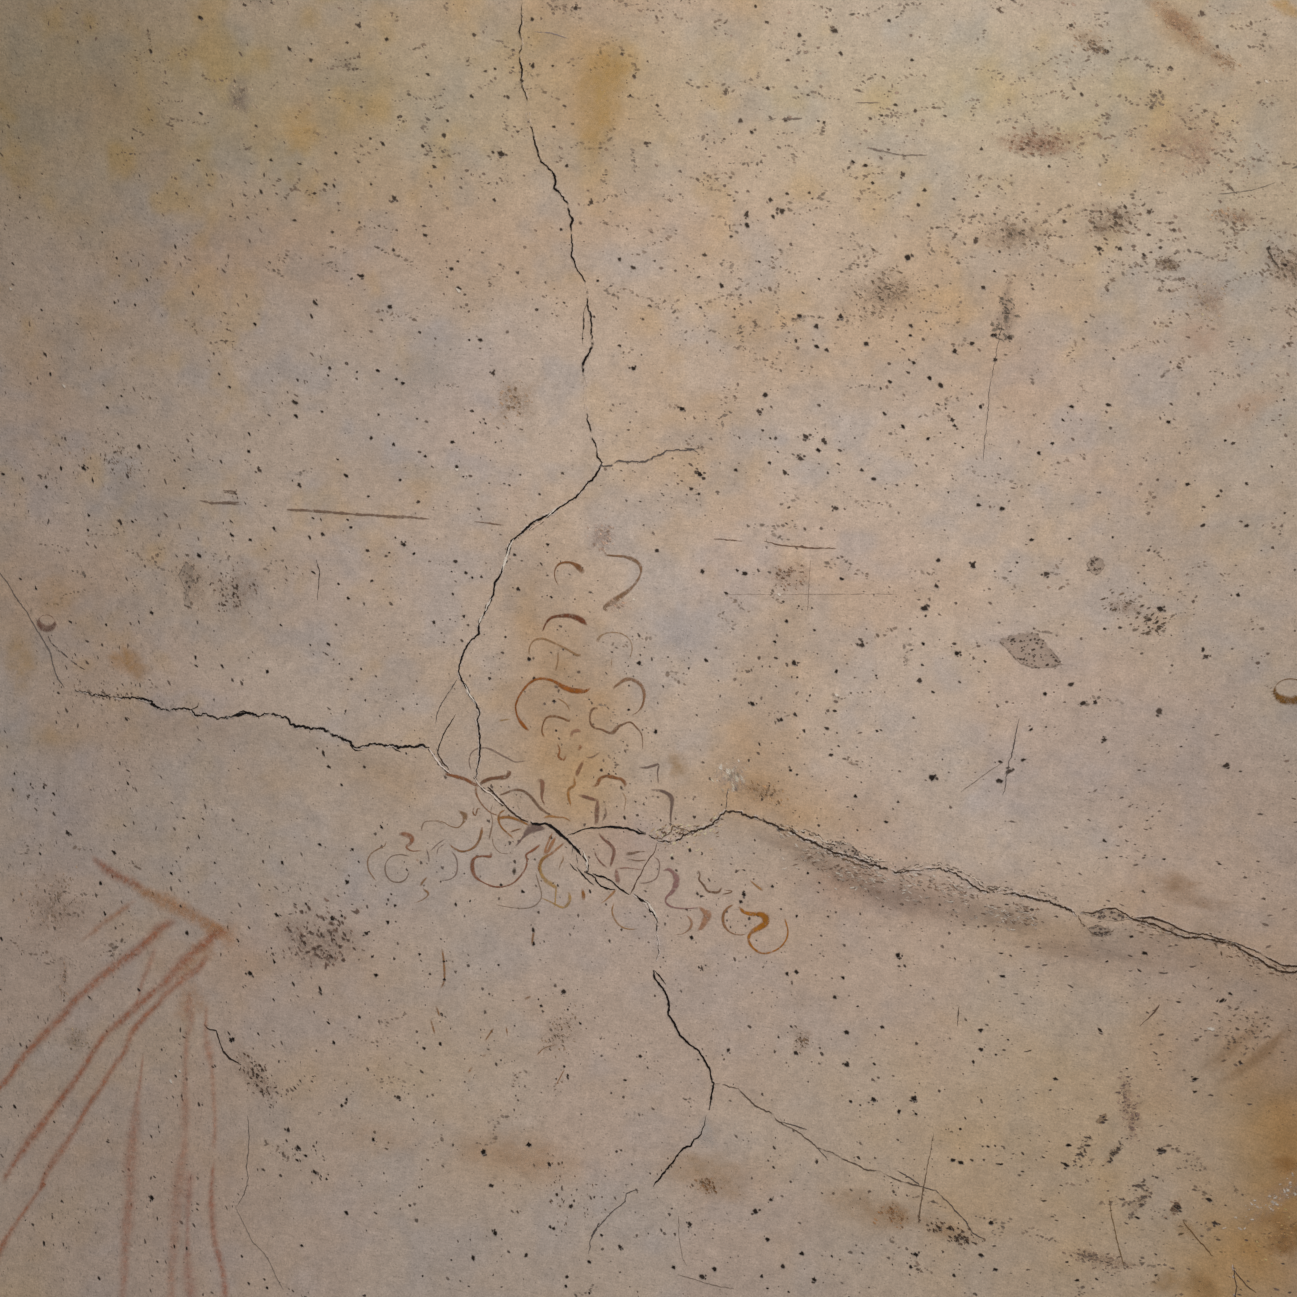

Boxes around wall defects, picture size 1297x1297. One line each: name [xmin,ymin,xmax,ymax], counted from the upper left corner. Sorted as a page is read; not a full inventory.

crack [518,6,593,372]
crack [983,325,1002,459]
crack [0,414,1297,1254]